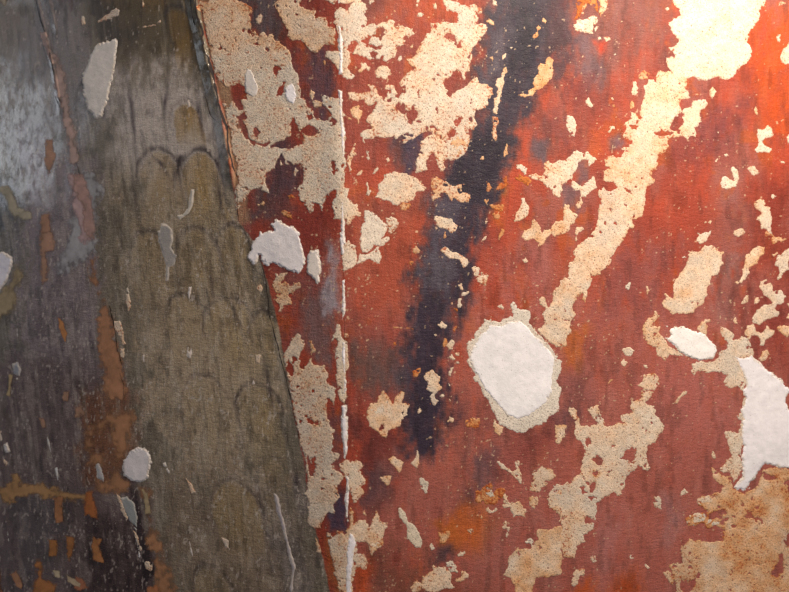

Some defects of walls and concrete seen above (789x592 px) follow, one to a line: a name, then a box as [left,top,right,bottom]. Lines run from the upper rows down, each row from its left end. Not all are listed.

rust [40,32,95,239]
crack [190,0,239,221]
peeling [484,0,766,347]
rust [96,306,128,400]
crack [258,254,300,443]
peeling [196,0,513,592]
peeling [735,194,789,362]
rust [33,562,88,592]
rust [0,410,137,523]
rust [91,537,104,563]
peeling [475,365,664,592]
peeling [663,451,789,592]